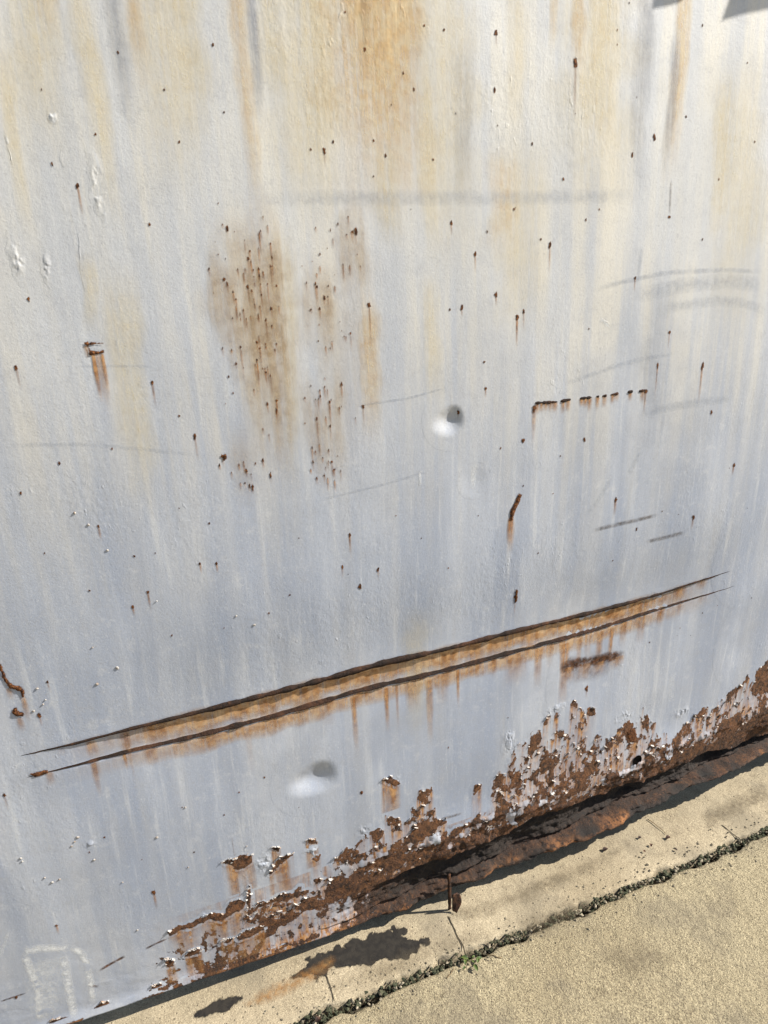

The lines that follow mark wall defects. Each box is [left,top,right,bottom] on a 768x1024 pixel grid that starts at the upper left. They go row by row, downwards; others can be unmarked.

rust [222,224,279,377]
rust [84,342,107,384]
rust [533,389,648,413]
rust [145,598,663,751]
peeling [147,657,768,990]
peeling [46,1014,70,1024]
peeling [90,998,113,1010]